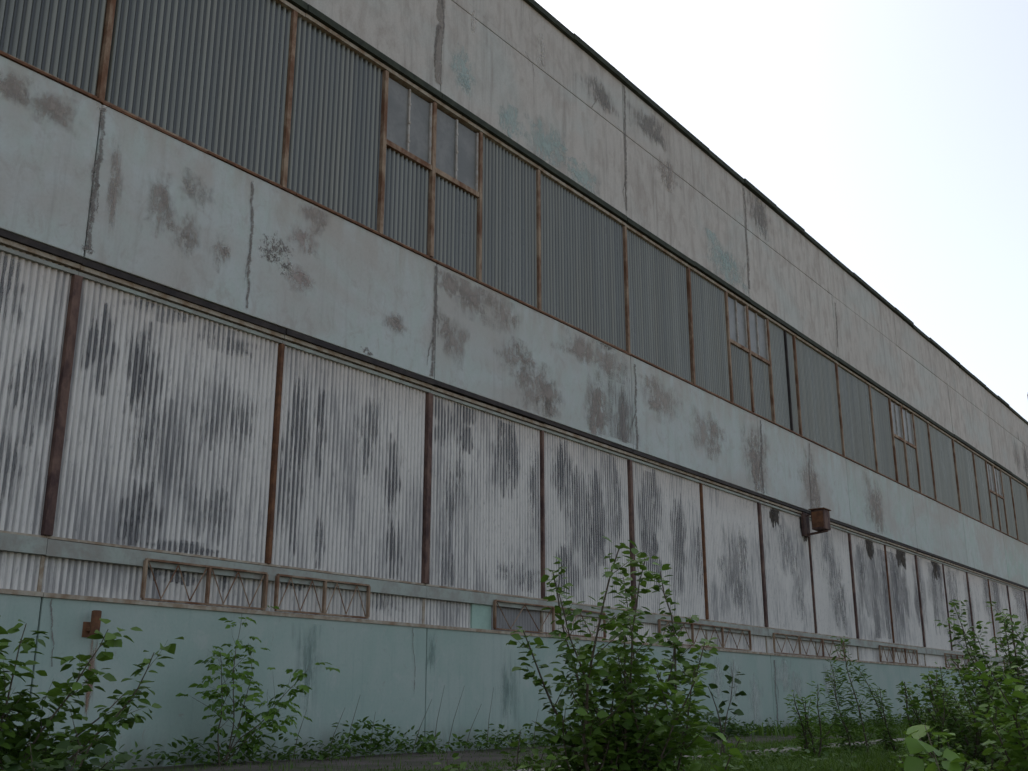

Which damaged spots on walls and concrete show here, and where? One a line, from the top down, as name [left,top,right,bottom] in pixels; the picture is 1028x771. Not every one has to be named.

crack [434,0,445,84]
crack [85,108,106,250]
crack [245,181,254,308]
water stain [769,508,779,527]
water stain [865,539,874,559]
water stain [896,549,906,569]